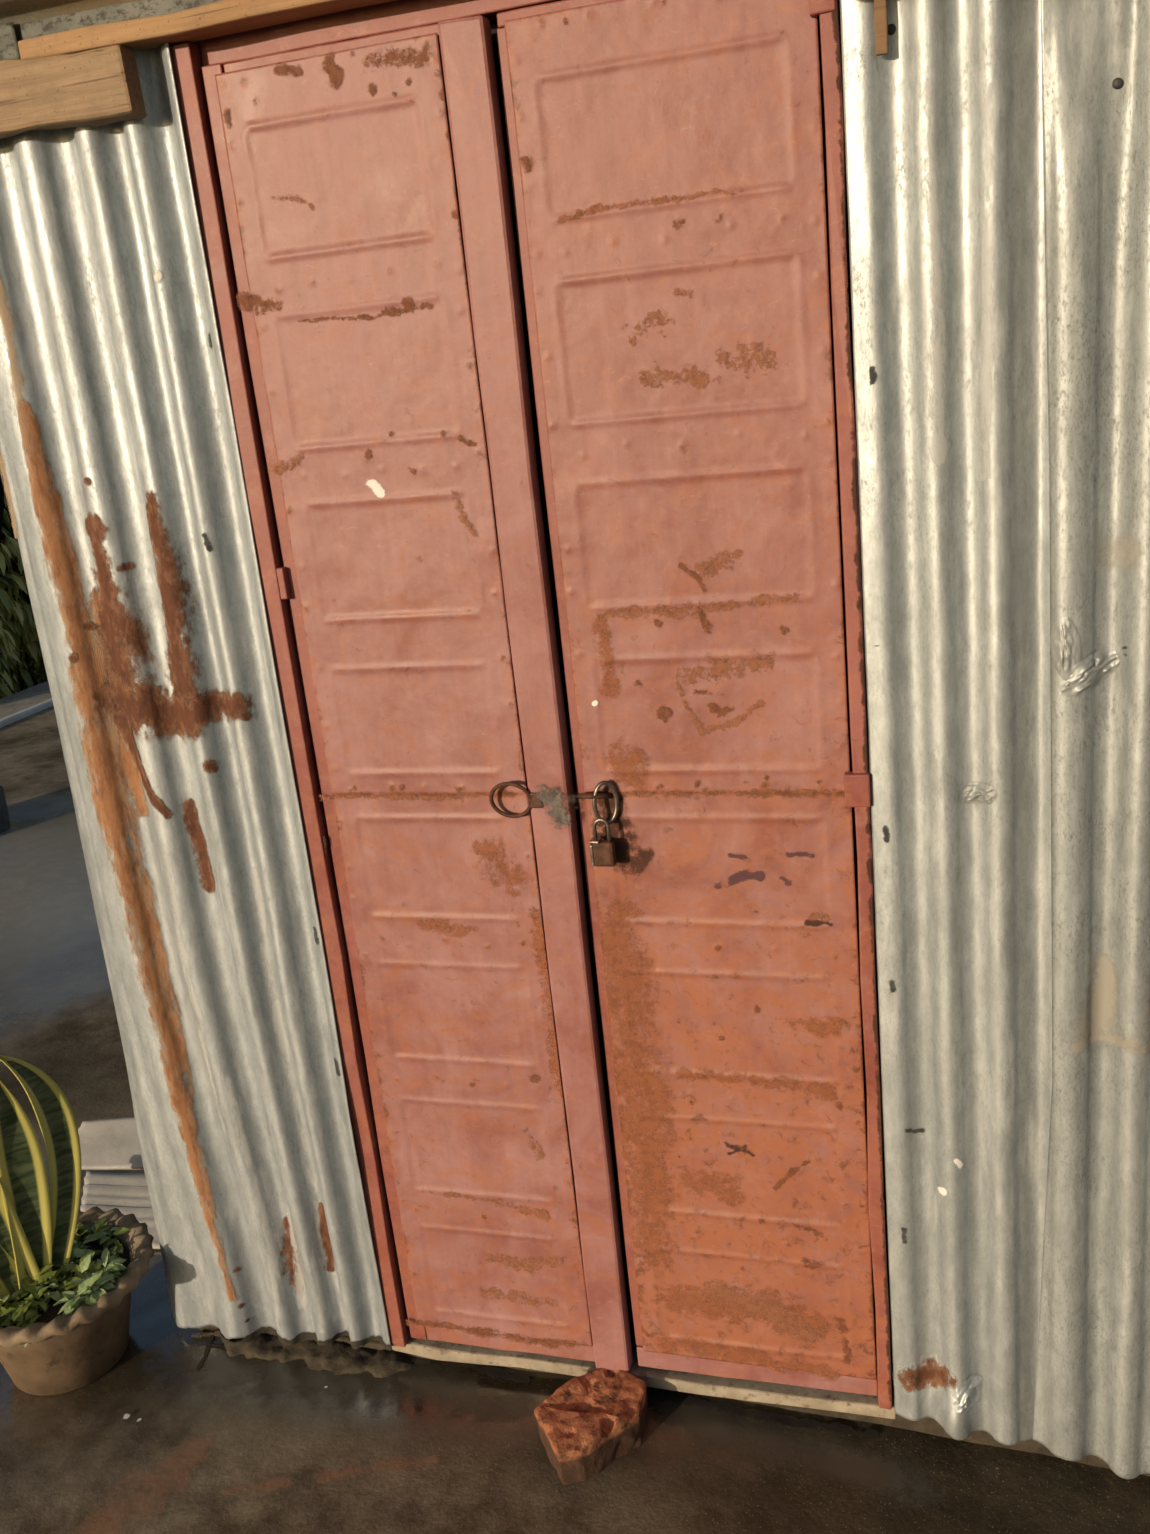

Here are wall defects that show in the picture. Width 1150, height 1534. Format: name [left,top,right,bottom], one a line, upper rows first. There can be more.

rust [831,0,867,774]
rust [593,615,619,696]
rust [0,278,253,1323]
rust [597,743,654,874]
rust [677,1068,837,1101]
rust [865,807,956,1401]
rust [724,1142,754,1157]
rust [773,1160,810,1190]
rust [281,1217,306,1307]
rust [318,1203,334,1272]
rust [651,1280,851,1381]